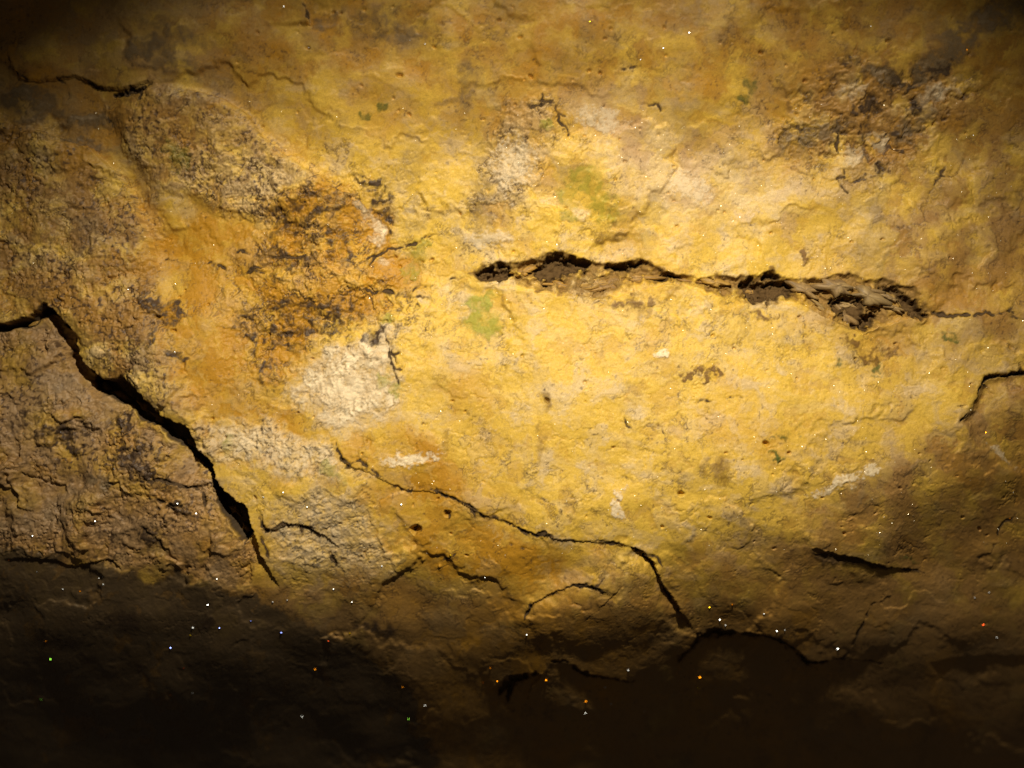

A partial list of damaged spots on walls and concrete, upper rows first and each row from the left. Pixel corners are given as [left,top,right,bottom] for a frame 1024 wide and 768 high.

leakage [279,191,357,262]
leakage [356,175,394,246]
leakage [269,244,314,269]
leakage [234,299,363,383]
leakage [360,326,385,346]
crack [931,306,1018,319]
crack [960,367,1024,421]
crack [148,476,206,508]
crack [336,442,680,619]